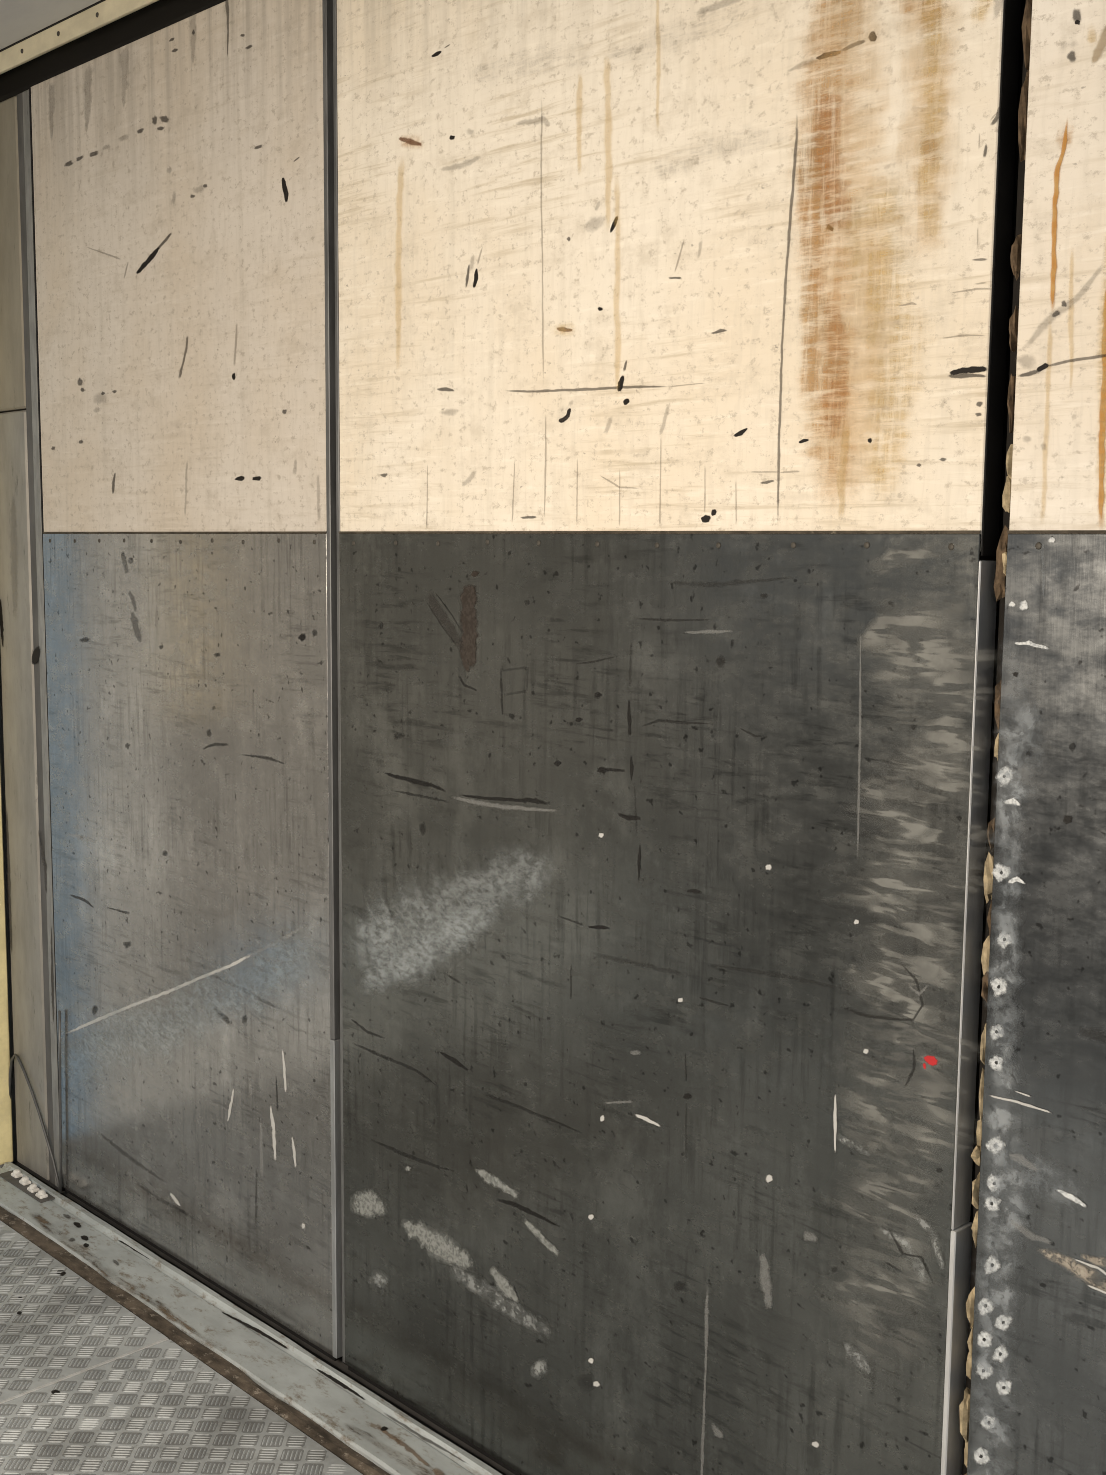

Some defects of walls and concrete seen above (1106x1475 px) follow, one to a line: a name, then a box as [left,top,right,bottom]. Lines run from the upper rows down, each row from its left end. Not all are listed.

corrosion [1051,126,1067,304]